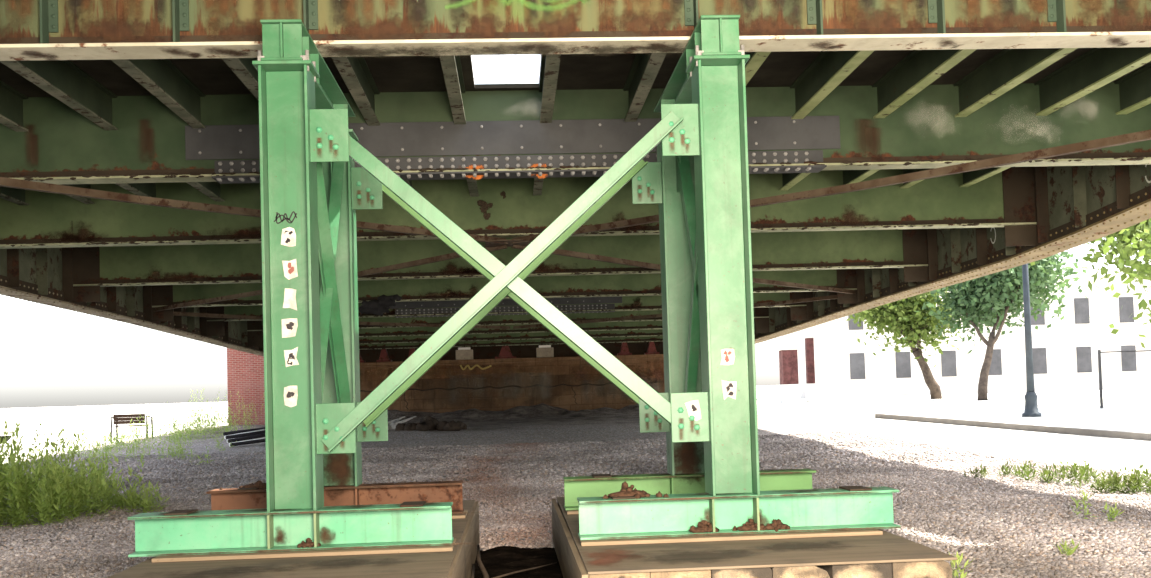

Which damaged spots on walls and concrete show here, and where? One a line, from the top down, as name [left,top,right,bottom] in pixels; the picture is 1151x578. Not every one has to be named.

corrosion [69,0,164,43]
corrosion [165,0,294,58]
corrosion [323,0,428,52]
corrosion [451,0,511,39]
corrosion [524,0,581,54]
corrosion [716,0,800,36]
corrosion [841,0,926,34]
corrosion [967,0,1047,33]
corrosion [1082,0,1151,46]
corrosion [132,430,458,519]
corrosion [585,419,901,565]
corrosion [246,527,462,552]